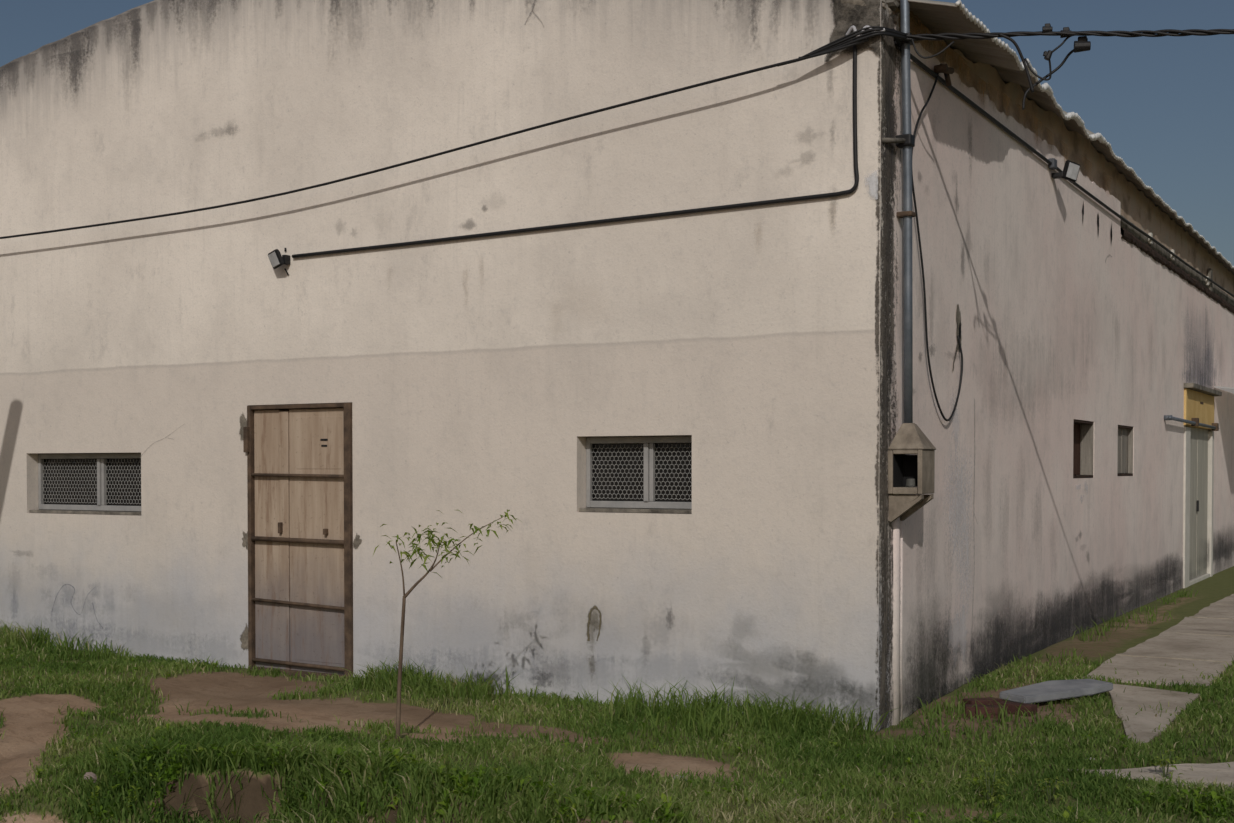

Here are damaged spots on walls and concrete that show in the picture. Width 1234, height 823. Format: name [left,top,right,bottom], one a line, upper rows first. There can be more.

leakage [973,571,1175,681]